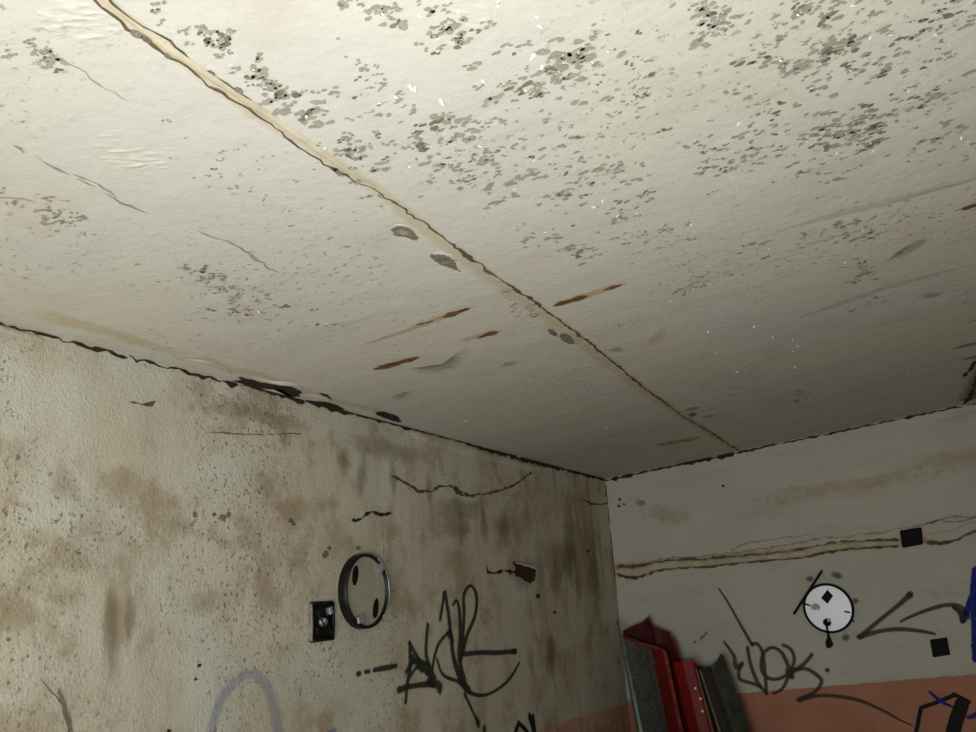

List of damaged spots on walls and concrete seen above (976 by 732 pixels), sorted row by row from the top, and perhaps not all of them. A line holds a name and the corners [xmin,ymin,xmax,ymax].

crack [13,145,145,213]
corrosion [417,308,470,325]
crack [93,0,976,591]
corrosion [553,296,587,306]
crack [0,322,238,388]
corrosion [374,357,419,370]
spalling [179,359,445,439]
spalling [512,561,538,584]